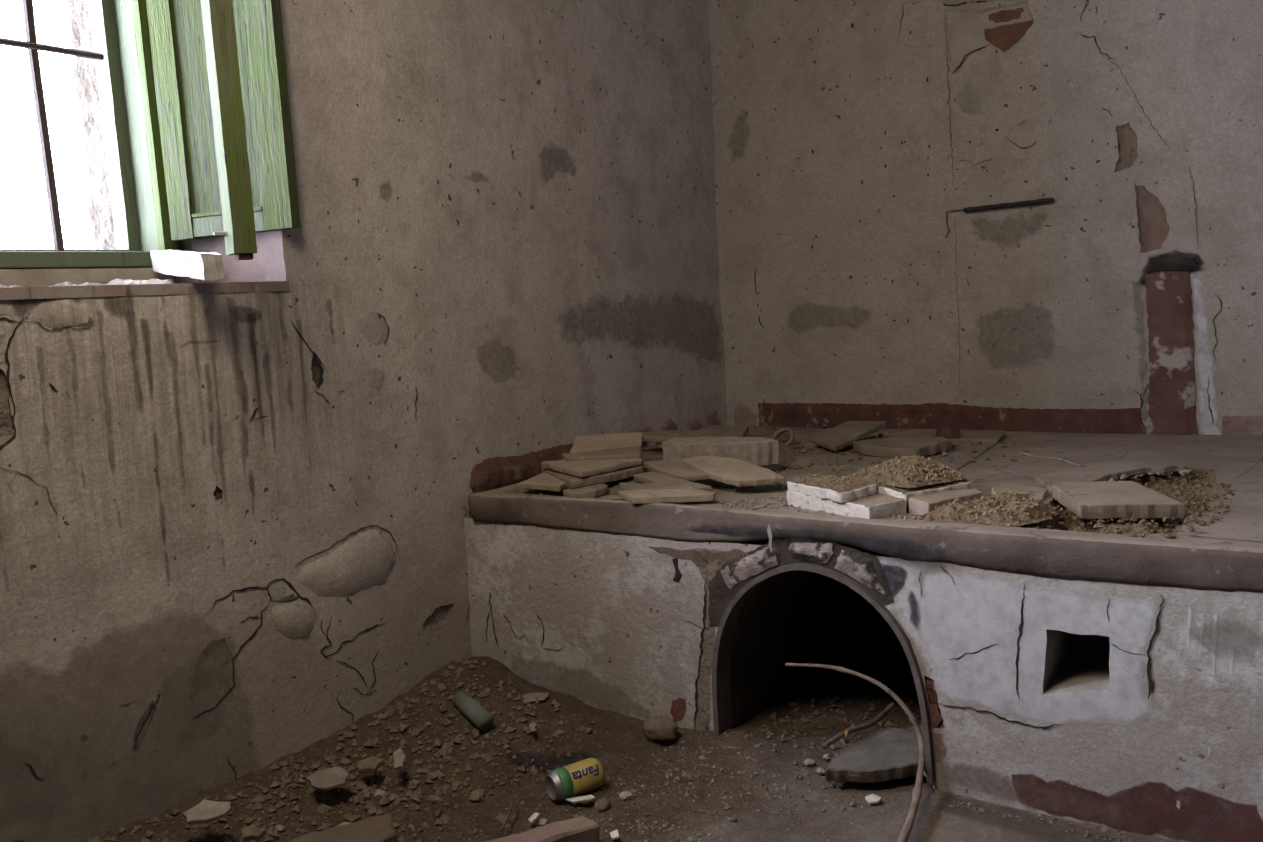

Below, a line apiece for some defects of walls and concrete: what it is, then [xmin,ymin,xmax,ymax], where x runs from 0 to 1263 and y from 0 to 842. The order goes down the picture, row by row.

crack [899,0,1011,35]
flaking render [946,1,1034,115]
crack [957,121,1036,166]
crack [1079,0,1198,245]
flaking render [1114,122,1170,253]
crack [0,313,94,513]
leakage [128,292,152,401]
flaking render [1193,278,1221,435]
crack [118,693,160,751]
crack [194,525,400,718]
crack [937,585,1059,729]
crack [1106,594,1164,699]